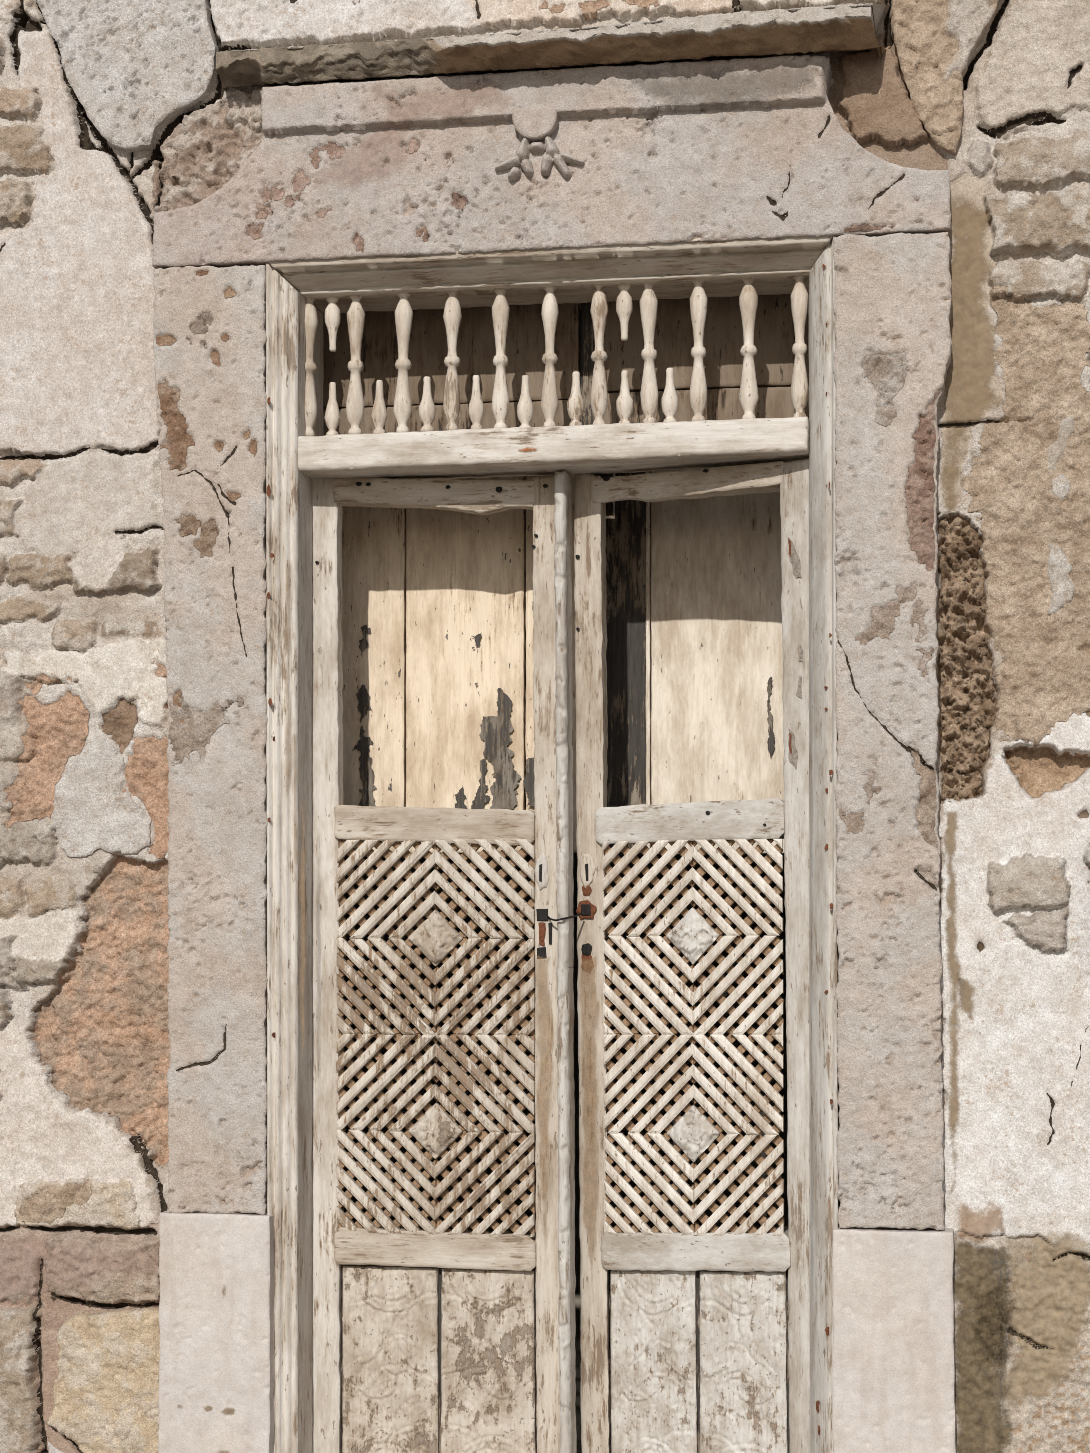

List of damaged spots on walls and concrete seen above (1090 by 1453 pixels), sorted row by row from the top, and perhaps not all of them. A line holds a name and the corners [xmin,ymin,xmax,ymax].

crack [963,0,1010,91]
crack [9,0,251,244]
crack [977,65,1083,138]
spalling [224,286,236,298]
crack [0,440,159,460]
spalling [243,430,257,455]
spalling [855,284,1090,847]
crack [837,640,934,770]
spalling [3,662,243,1166]
crack [1052,1252,1090,1262]